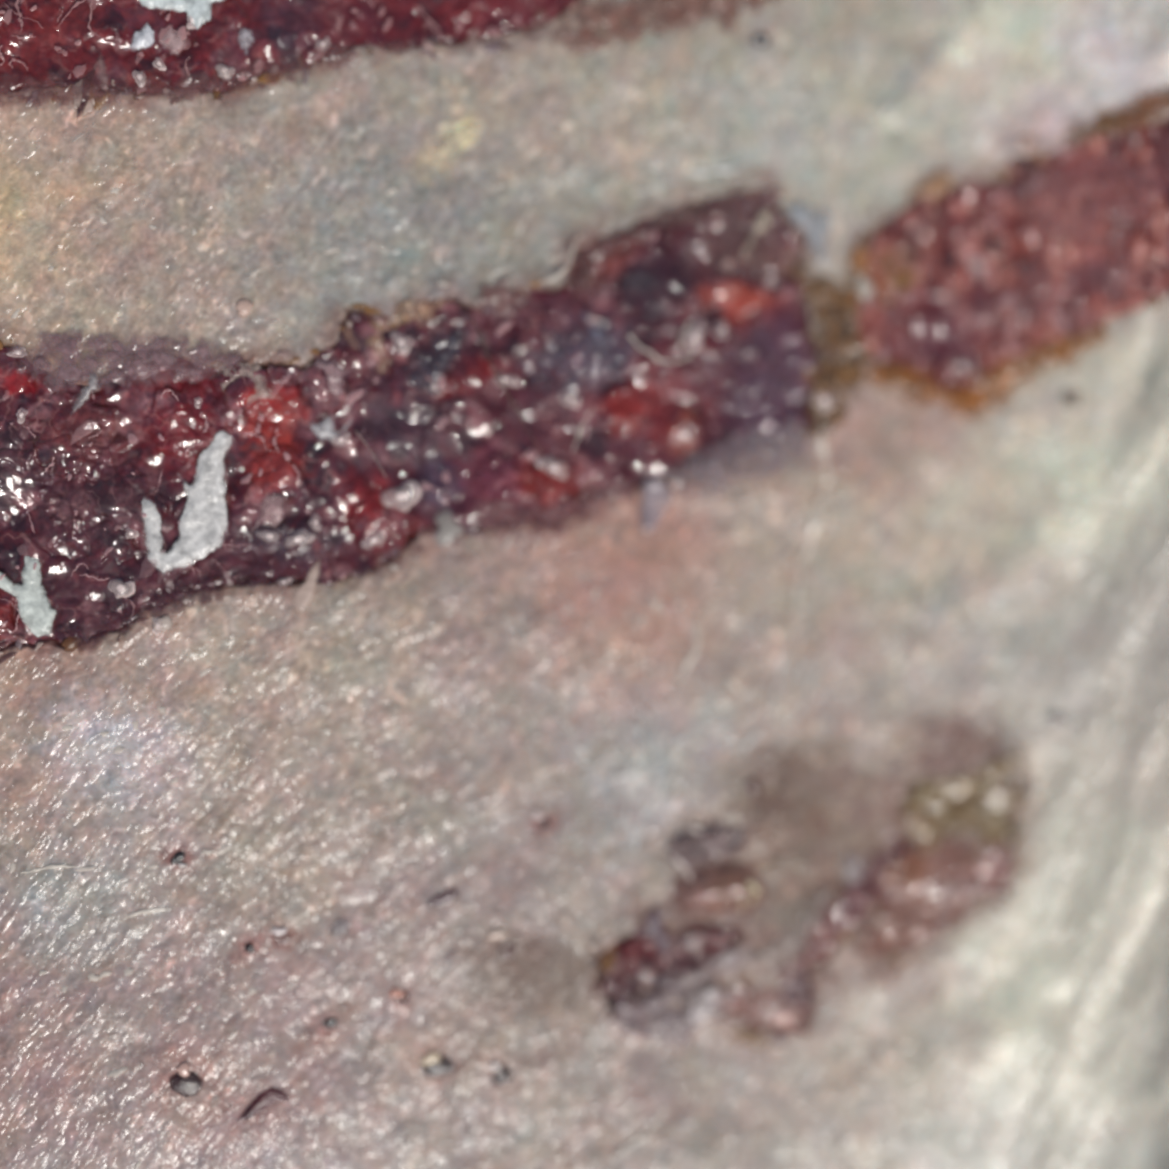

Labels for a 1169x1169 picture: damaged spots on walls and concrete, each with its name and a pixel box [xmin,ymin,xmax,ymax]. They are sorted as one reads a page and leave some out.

peeling [141,0,215,28]
peeling [223,365,262,388]
peeling [141,432,231,572]
peeling [0,556,55,636]